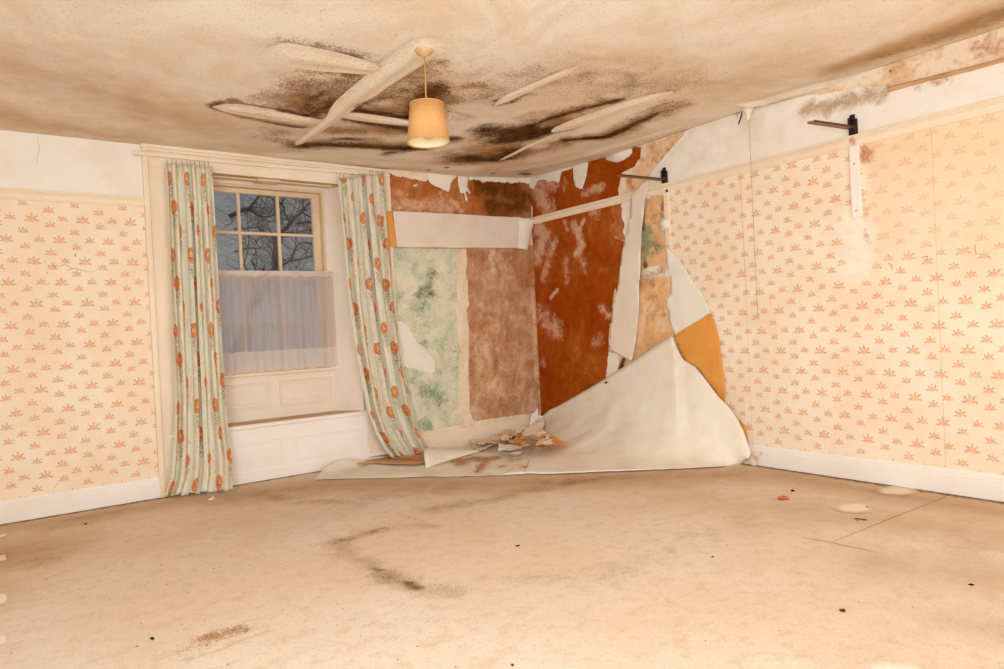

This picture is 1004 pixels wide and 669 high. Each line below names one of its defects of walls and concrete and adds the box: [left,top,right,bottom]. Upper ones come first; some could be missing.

damp [207,60,692,166]
damp [802,90,886,113]
flaking render [765,27,1004,106]
flaking render [386,132,684,431]